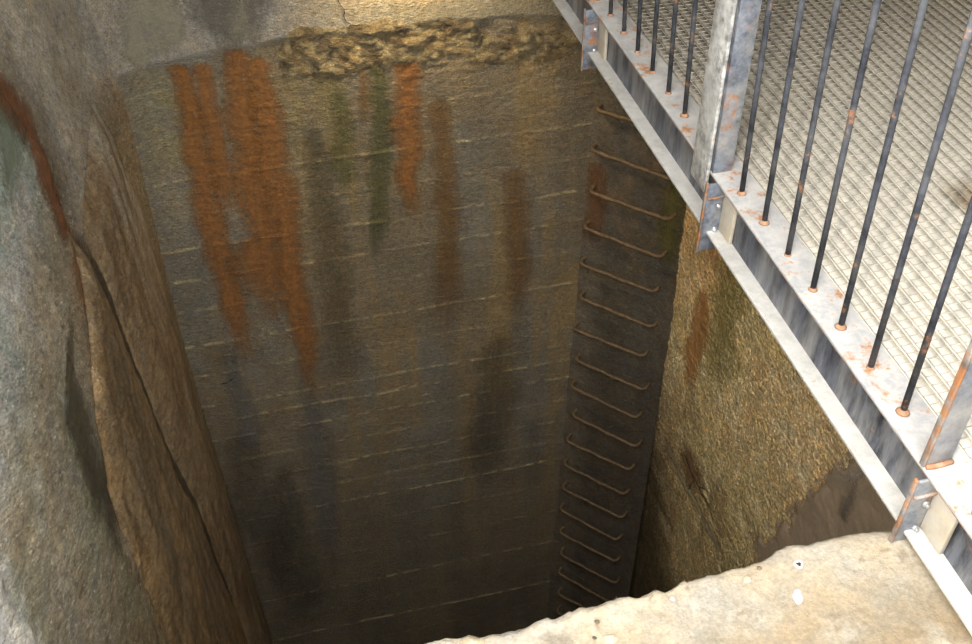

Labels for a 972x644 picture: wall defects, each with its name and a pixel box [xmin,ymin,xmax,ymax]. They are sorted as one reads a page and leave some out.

spalling [276,18,578,83]
rust [391,63,423,208]
rust [686,292,708,382]